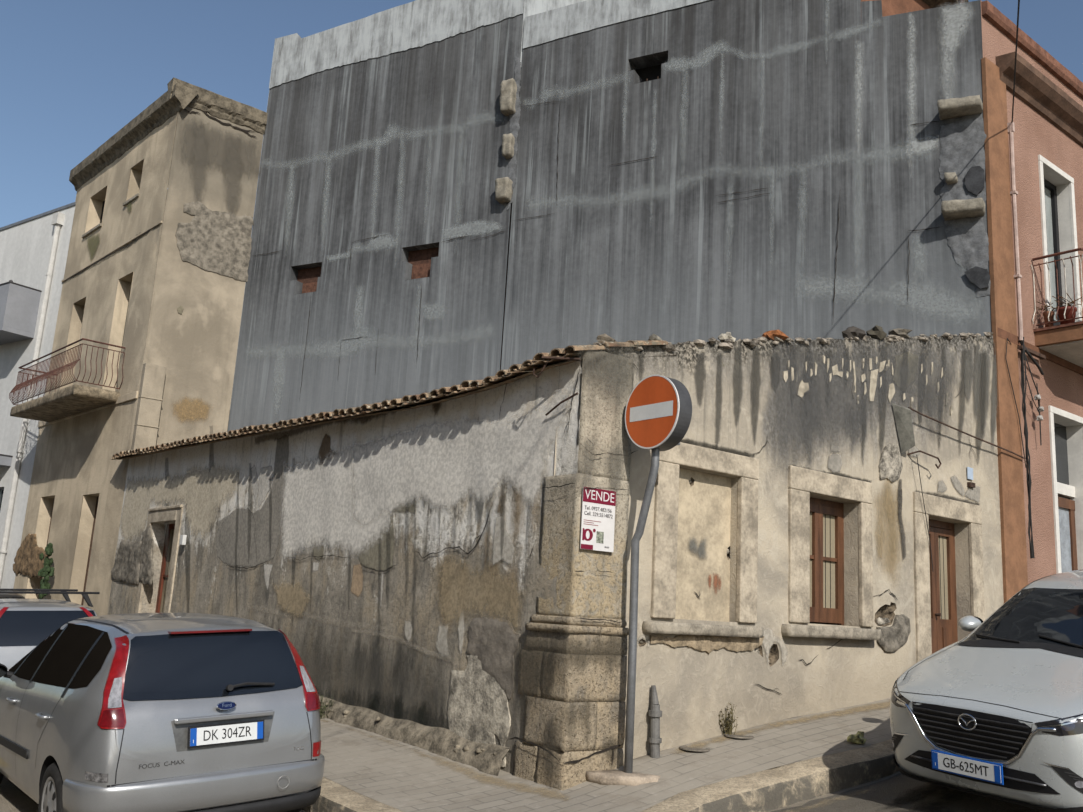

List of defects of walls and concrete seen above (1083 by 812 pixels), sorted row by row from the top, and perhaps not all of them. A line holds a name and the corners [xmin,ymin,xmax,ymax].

leakage [182,122,257,213]
spalling [939,117,987,202]
leakage [444,221,500,237]
spalling [942,214,991,298]
leakage [680,346,812,457]
leakage [879,386,887,454]
leakage [939,345,998,462]
spalling [111,525,154,585]
flaking render [351,500,416,603]
leakage [360,611,464,661]
spalling [874,602,896,627]
leakage [343,695,442,727]